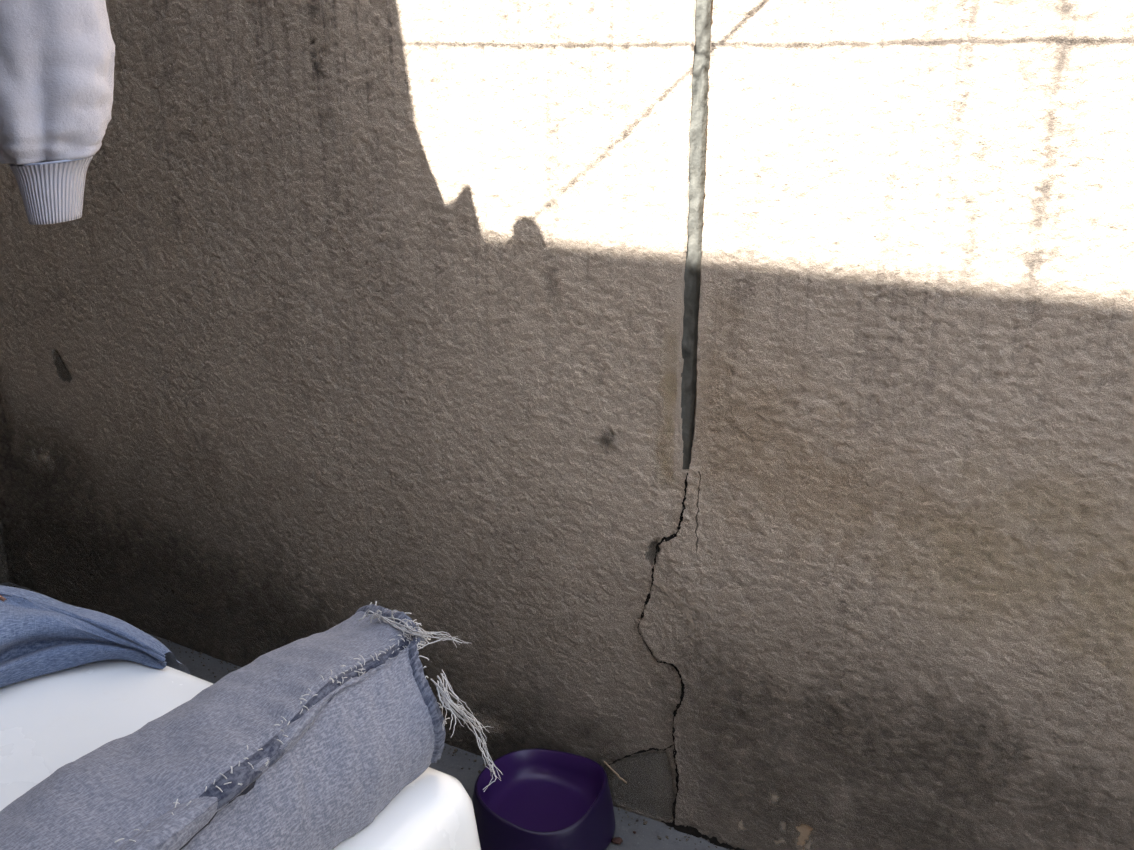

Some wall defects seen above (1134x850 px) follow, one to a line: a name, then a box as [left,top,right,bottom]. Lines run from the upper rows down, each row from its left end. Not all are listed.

leakage [0,410,326,667]
leakage [423,670,565,761]
crack [603,471,701,827]